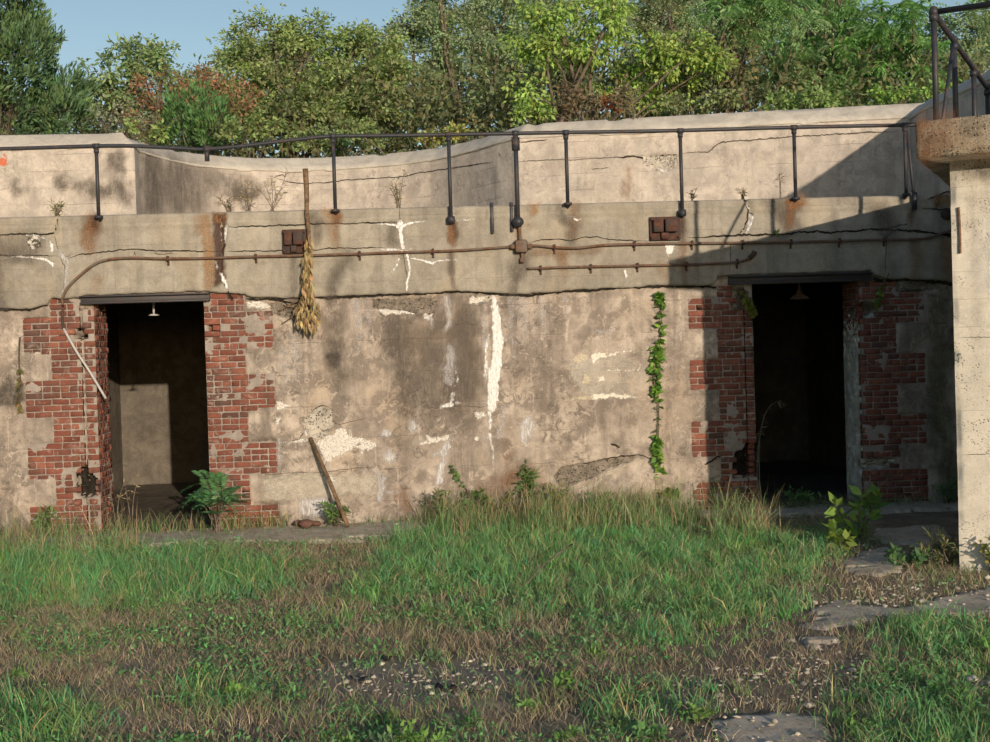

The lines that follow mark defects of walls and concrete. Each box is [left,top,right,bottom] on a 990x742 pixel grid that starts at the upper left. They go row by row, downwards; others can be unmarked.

crack [274,131,888,184]
rust [203,214,226,285]
water stain [377,220,456,291]
water stain [388,295,504,459]
spalling [76,467,100,498]
peeling [262,473,384,517]
peeling [285,407,391,463]
spalling [553,455,636,491]
spalling [732,442,759,478]